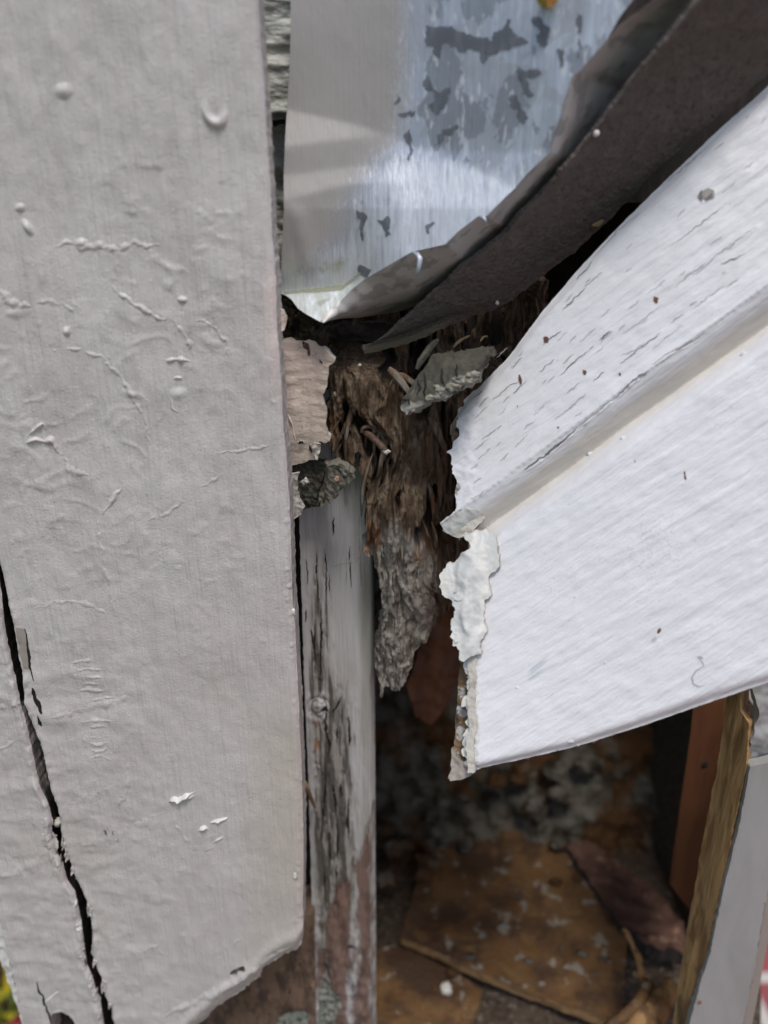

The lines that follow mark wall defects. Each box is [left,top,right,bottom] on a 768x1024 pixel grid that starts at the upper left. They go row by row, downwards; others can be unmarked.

peeling [424,370,481,401]
crack [470,162,758,500]
crack [15,627,42,726]
peeling [439,508,501,773]
crack [36,982,59,1024]
crack [46,830,112,1024]
leakage [316,827,375,1024]